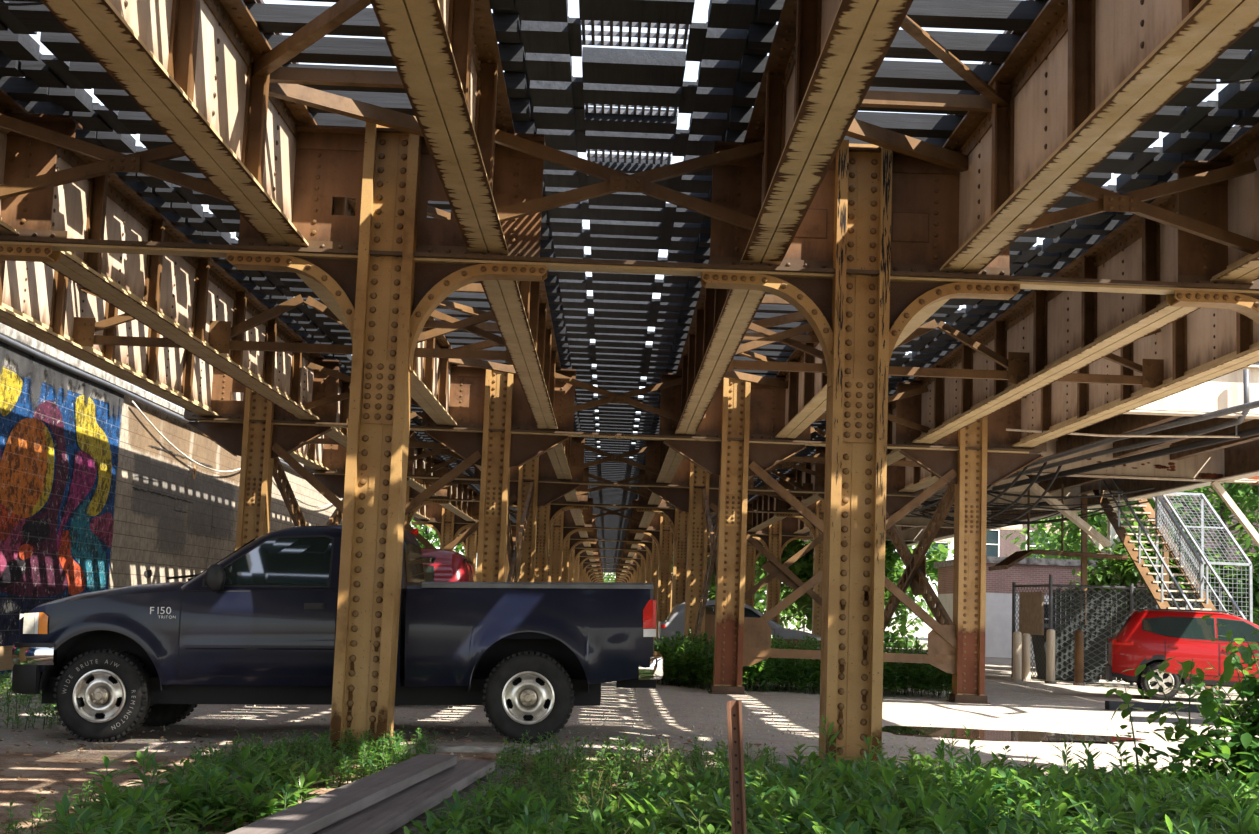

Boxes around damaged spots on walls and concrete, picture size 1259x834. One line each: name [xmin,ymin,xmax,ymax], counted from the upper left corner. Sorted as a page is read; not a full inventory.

corrosion [715,615,744,685]
corrosion [957,629,985,694]